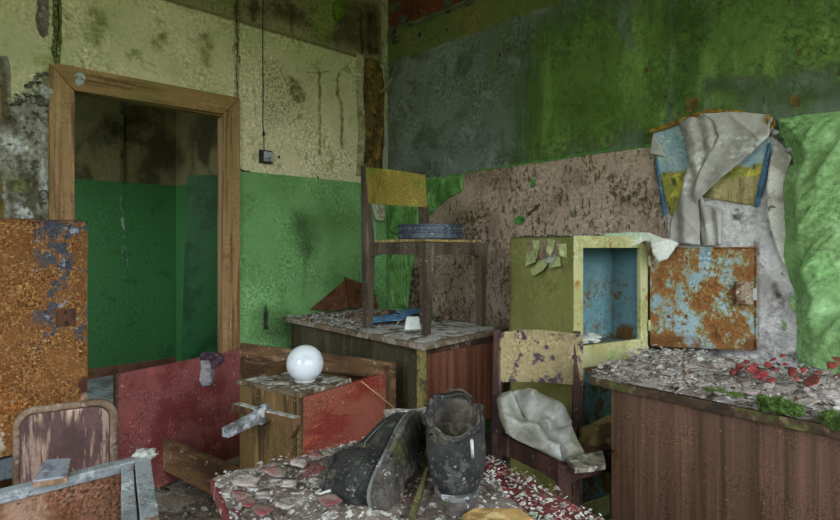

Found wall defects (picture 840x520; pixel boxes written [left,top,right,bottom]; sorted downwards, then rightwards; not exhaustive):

spalling [0,56,54,219]
crack [232,0,241,97]
spalling [356,0,475,176]
spalling [372,204,386,240]
peeling [408,256,421,315]
peeling [429,144,673,331]
spalling [648,136,799,368]